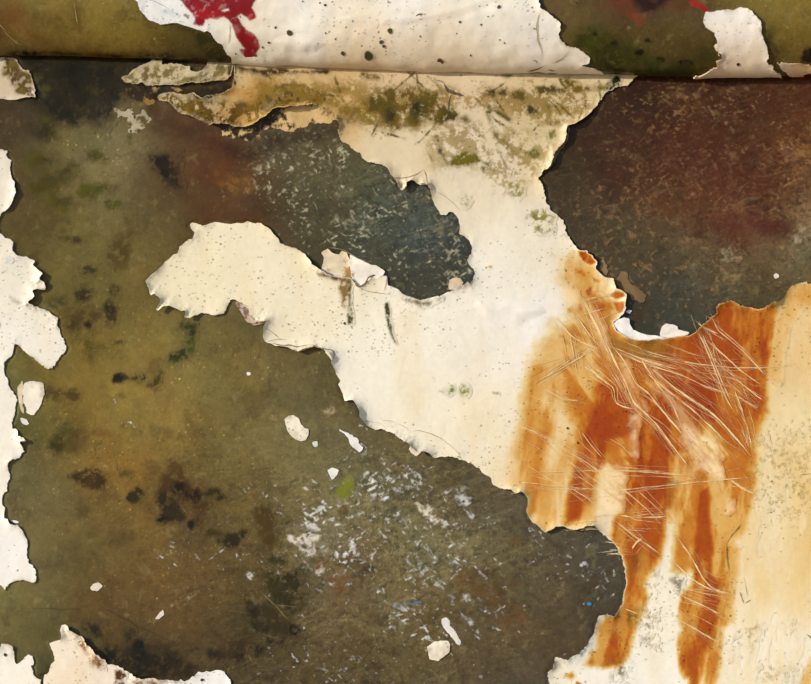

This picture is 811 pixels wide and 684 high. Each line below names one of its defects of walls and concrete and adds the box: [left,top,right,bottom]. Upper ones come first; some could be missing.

peeling [28,0,201,69]
corrosion [173,147,269,226]
leakage [122,60,623,202]
mould [523,204,558,237]
peeling [527,0,811,340]
peeling [0,33,627,684]
corrosion [502,83,811,684]
corrosion [446,562,535,633]